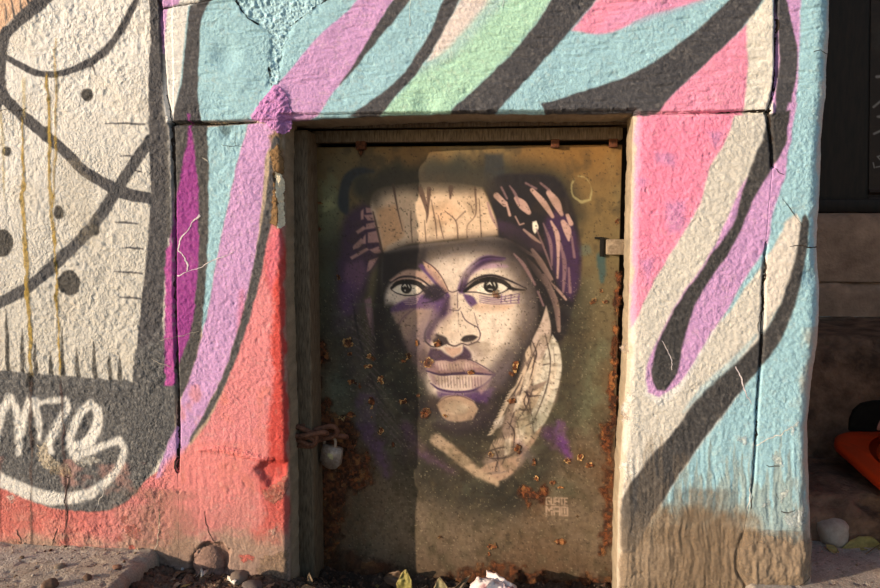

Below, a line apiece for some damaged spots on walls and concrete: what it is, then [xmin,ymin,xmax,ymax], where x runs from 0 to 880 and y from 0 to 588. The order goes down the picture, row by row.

crack [680,16,784,175]
crack [166,95,257,473]
rust [321,377,375,564]
rust [466,543,612,586]
rust [590,271,621,556]
crack [750,241,780,509]